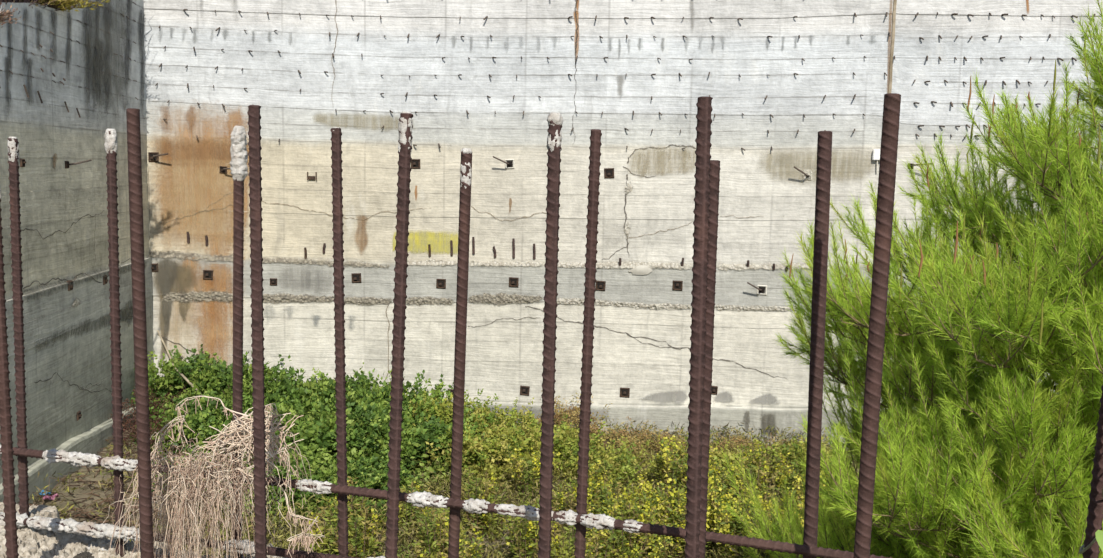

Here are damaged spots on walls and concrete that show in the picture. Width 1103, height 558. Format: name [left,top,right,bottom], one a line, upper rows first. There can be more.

damp [6,0,145,112]
corrosion [161,108,249,363]
crack [603,144,711,259]
crack [468,306,785,378]